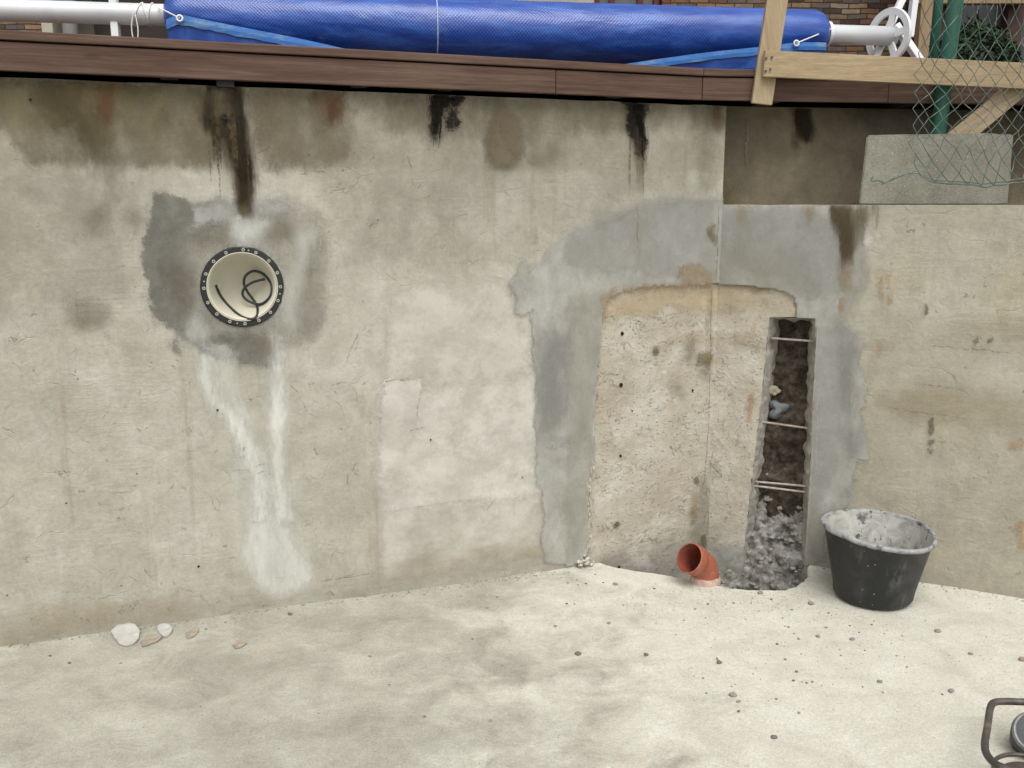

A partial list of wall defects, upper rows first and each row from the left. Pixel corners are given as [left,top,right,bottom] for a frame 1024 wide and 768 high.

water stain [0,77,347,237]
water stain [414,95,465,148]
water stain [620,102,651,198]
water stain [830,205,866,267]
water stain [140,192,311,591]
spalling [583,283,816,582]